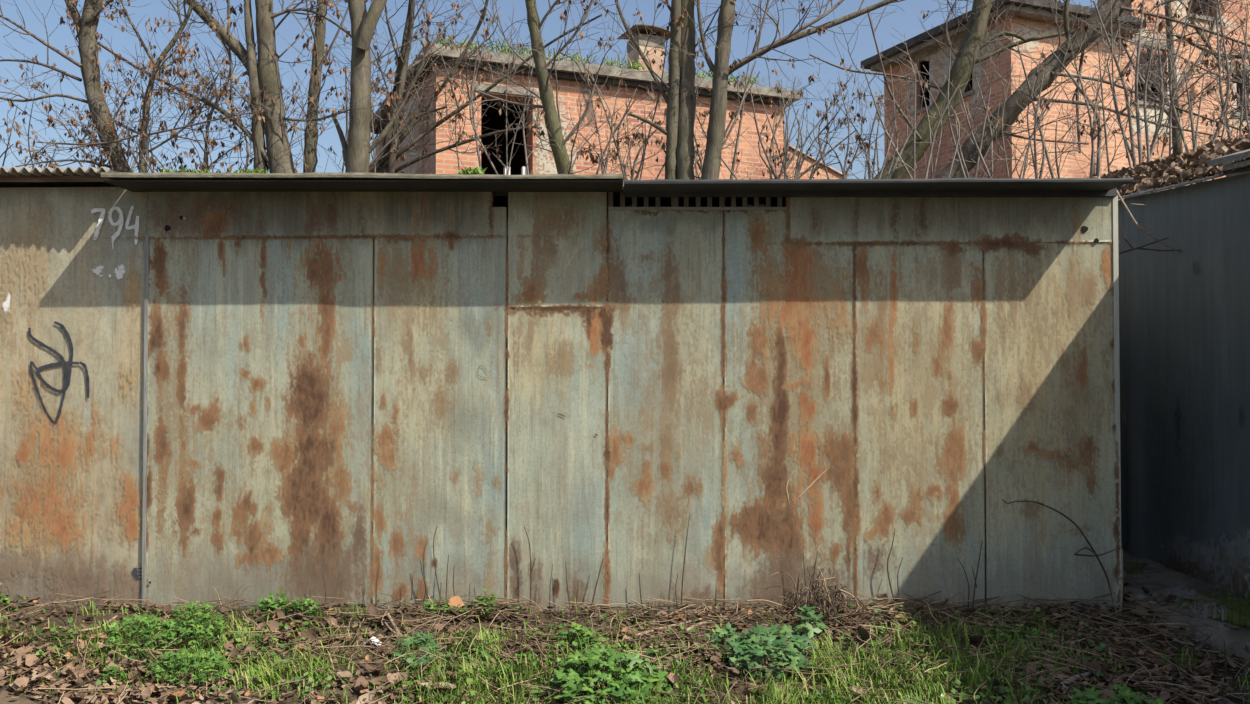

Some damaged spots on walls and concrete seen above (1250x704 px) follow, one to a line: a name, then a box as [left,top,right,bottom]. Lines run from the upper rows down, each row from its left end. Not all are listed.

rust [0,196,509,606]
rust [482,197,1114,612]